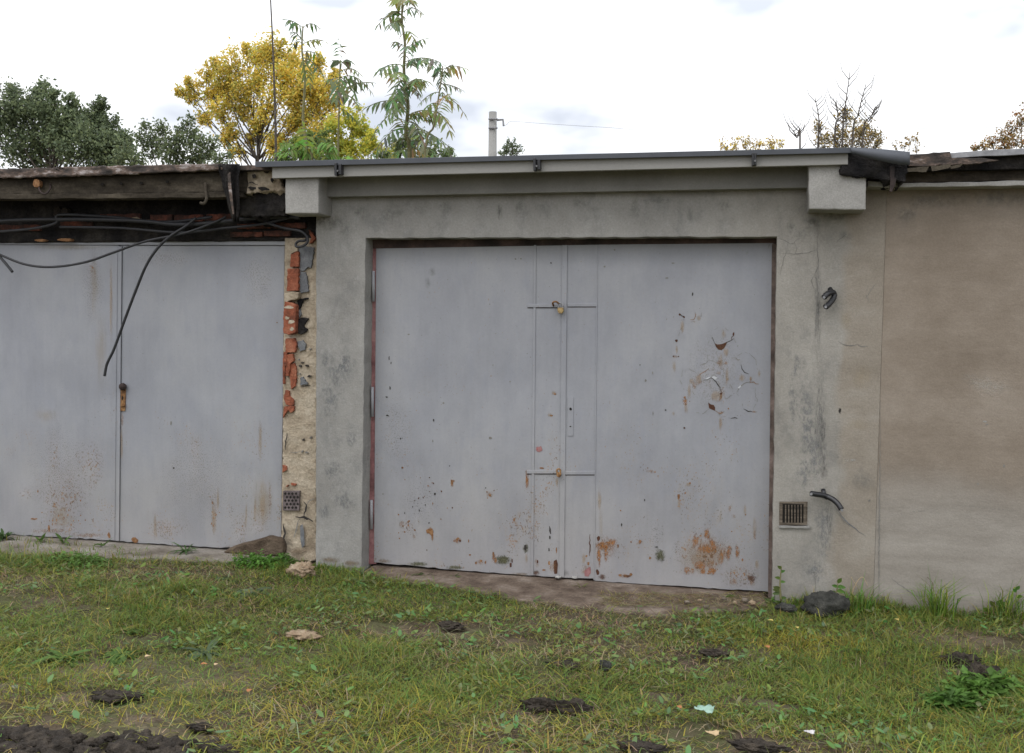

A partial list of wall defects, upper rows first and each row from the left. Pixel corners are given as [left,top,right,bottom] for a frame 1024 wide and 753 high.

flaking render [276,230,317,418]
peeling [691,352,756,414]
corrosion [398,477,454,551]
corrosion [596,536,641,579]
corrosion [681,530,754,584]